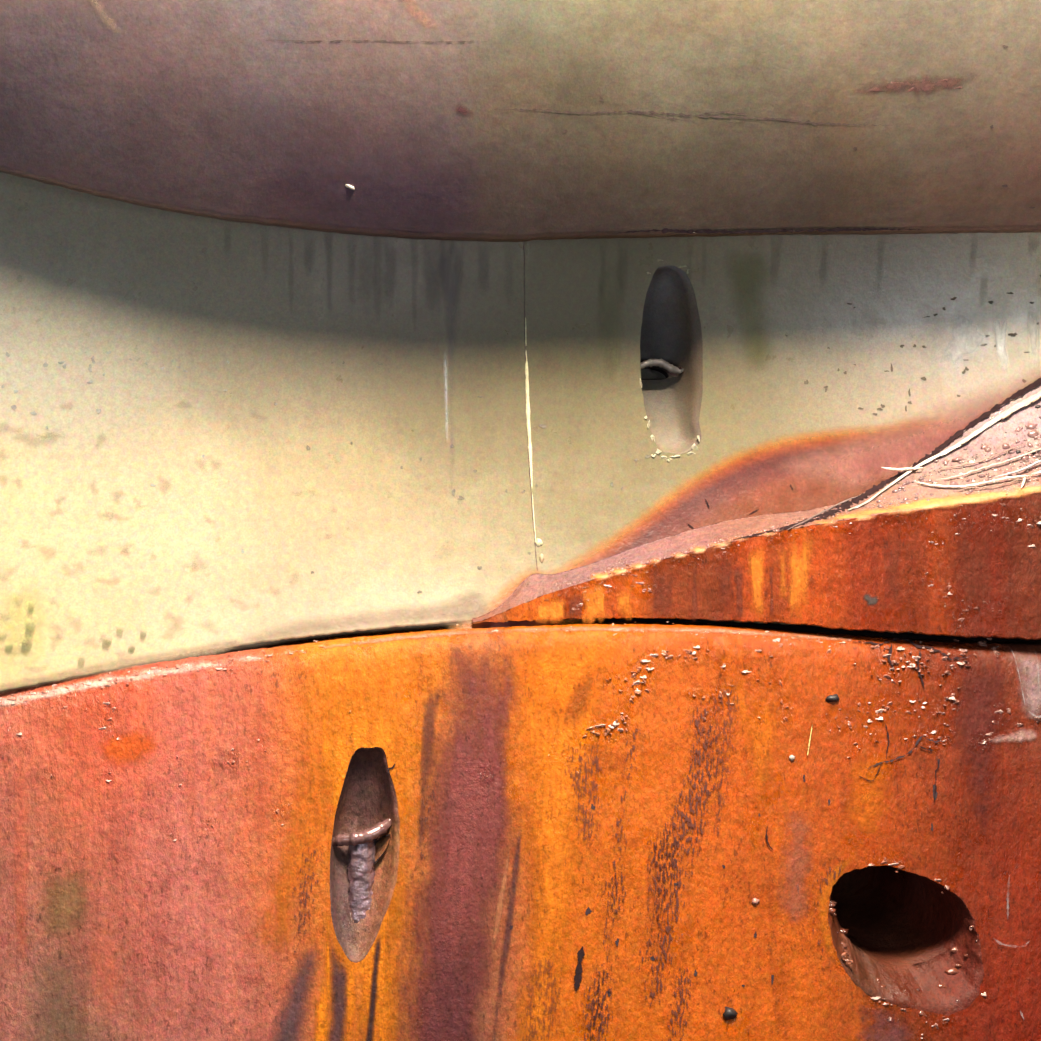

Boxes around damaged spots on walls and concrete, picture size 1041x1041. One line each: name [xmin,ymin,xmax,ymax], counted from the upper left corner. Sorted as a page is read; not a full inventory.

water stain [996,325,1006,359]
spalling [634,416,700,462]
crack [527,433,538,571]
rust [459,385,1041,629]
water stain [0,644,228,705]
rust [106,734,152,761]
rust [278,692,405,931]
rust [523,642,612,1041]
rust [820,866,849,955]
rust [316,876,398,1041]
rust [937,947,968,989]
spalling [871,997,950,1039]